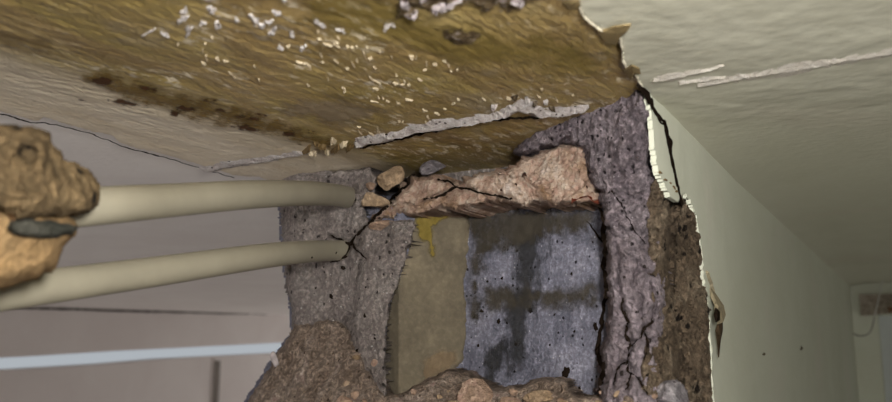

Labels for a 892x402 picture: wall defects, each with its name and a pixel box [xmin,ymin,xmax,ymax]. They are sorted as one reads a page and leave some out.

leakage [177,0,222,39]
leakage [235,0,287,51]
peeling [296,30,413,105]
peeling [393,55,458,87]
spalling [395,0,549,21]
peeling [563,0,644,87]
peeling [302,137,354,158]
crack [360,116,539,149]
crack [636,48,892,207]
crack [330,174,512,263]
crack [571,190,674,402]
peeling [706,270,726,357]